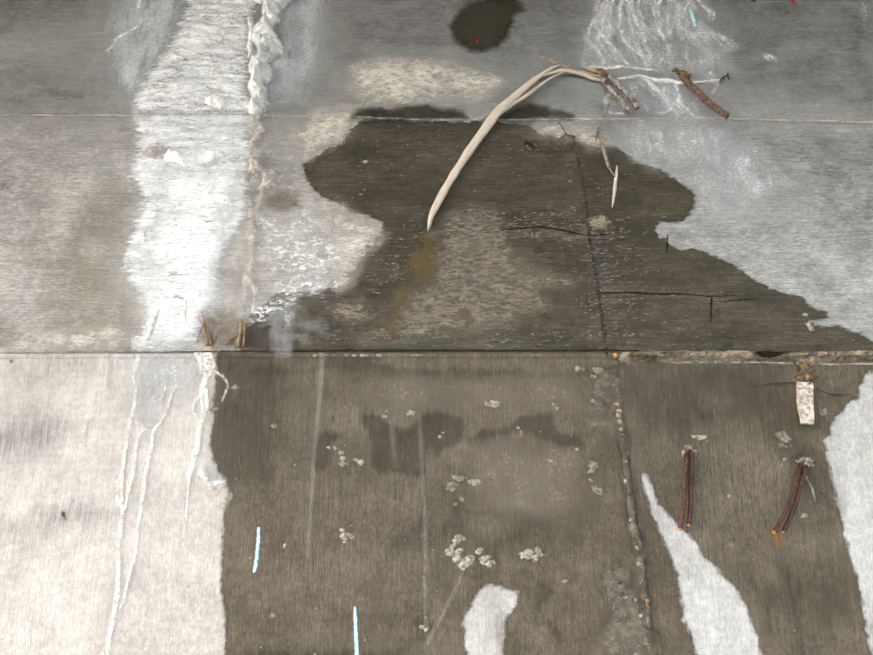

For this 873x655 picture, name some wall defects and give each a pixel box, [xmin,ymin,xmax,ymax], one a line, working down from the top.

leakage [451,0,522,52]
leakage [584,0,724,125]
leakage [107,0,320,350]
crack [501,210,604,239]
leakage [210,58,873,655]
crack [601,292,749,322]